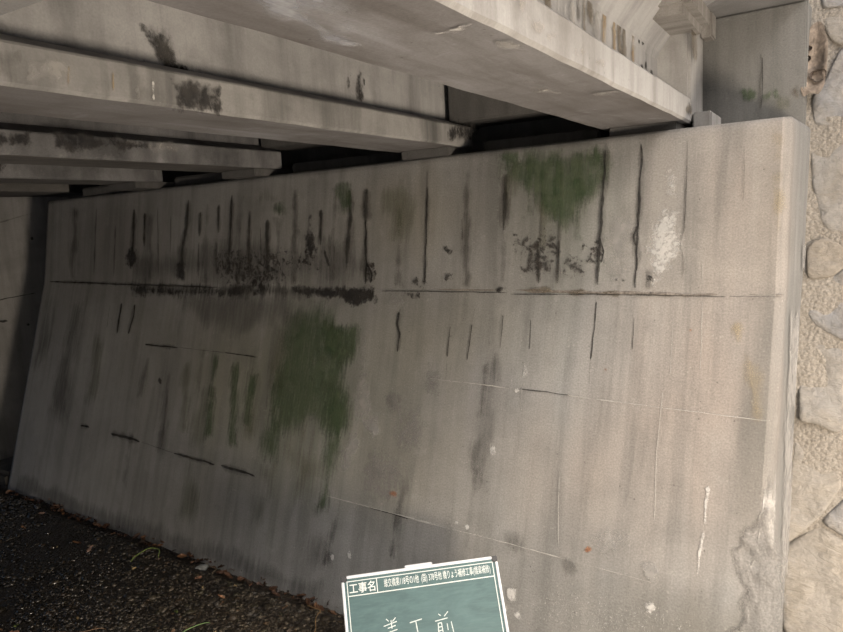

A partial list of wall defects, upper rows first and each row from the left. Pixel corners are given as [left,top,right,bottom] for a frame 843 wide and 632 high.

water stain [142,25,188,71]
water stain [176,81,222,115]
water stain [55,132,148,153]
water stain [176,204,189,280]
water stain [195,197,329,297]
water stain [336,187,352,263]
crack [364,220,376,283]
water stain [513,228,601,293]
crack [405,145,764,359]
crack [50,281,217,348]
water stain [293,286,374,305]
spalling [731,423,792,632]